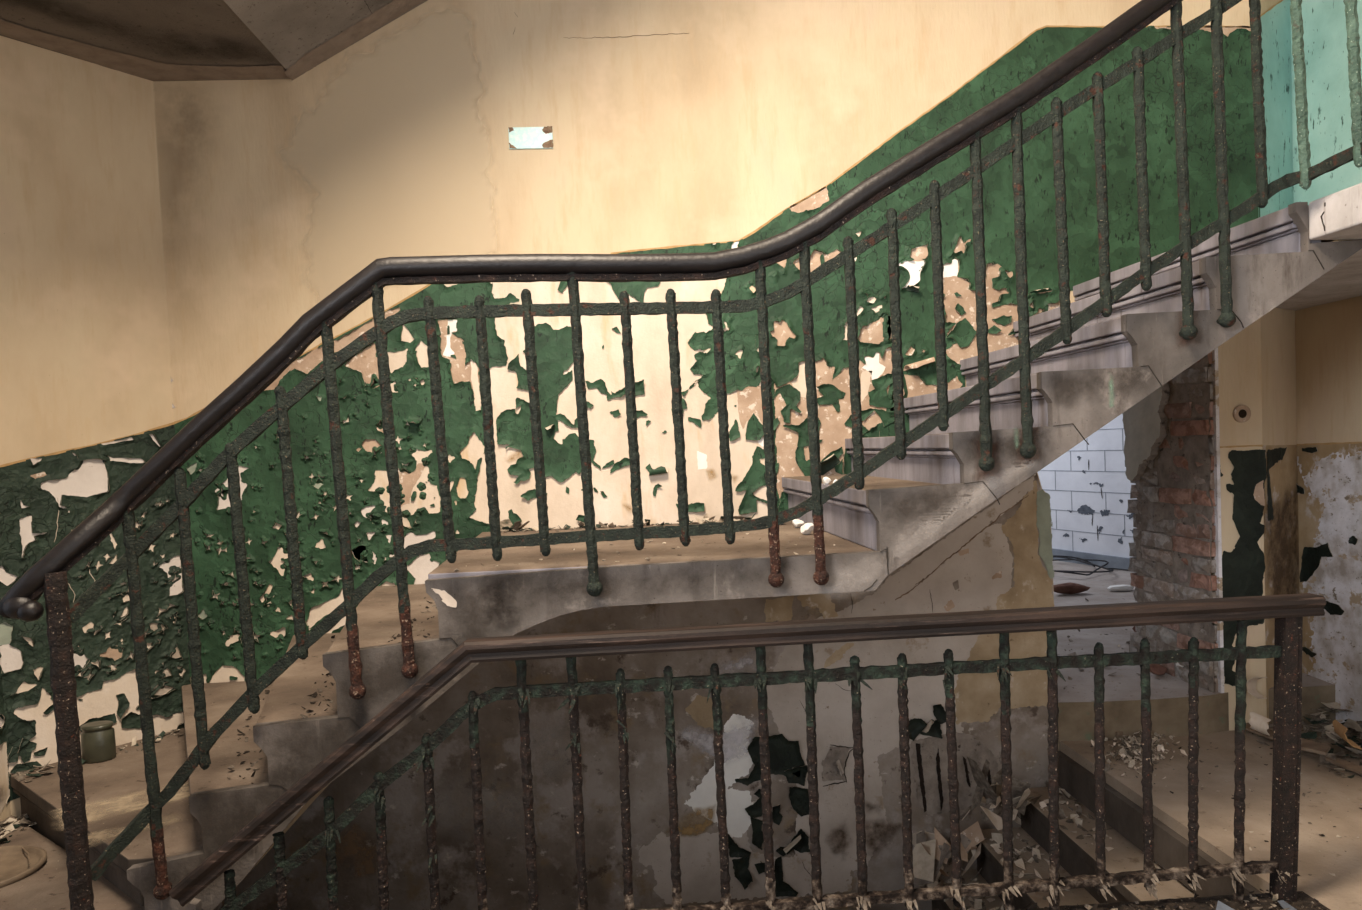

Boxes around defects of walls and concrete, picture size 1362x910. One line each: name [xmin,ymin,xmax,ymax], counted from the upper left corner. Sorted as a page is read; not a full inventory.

peeling [0,431,163,590]
peeling [72,227,1060,746]
flaking render [764,352,1362,732]
peeling [0,618,58,814]
flaking render [638,631,1048,910]
peeling [1047,880,1065,906]
peeling [1100,879,1117,900]
peeling [1147,873,1161,901]
peeling [1186,873,1207,891]
peeling [1230,868,1248,893]